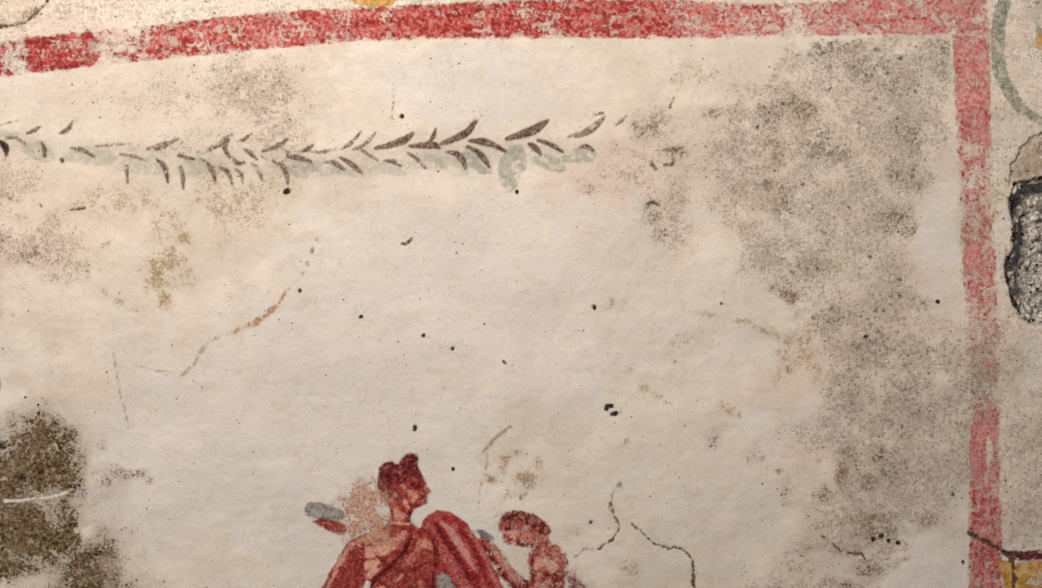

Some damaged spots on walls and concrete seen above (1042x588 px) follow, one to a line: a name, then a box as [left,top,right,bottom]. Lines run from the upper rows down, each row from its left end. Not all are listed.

crack [0,0,49,28]
damp [0,403,138,588]
crack [574,482,696,588]
crack [968,532,1018,588]